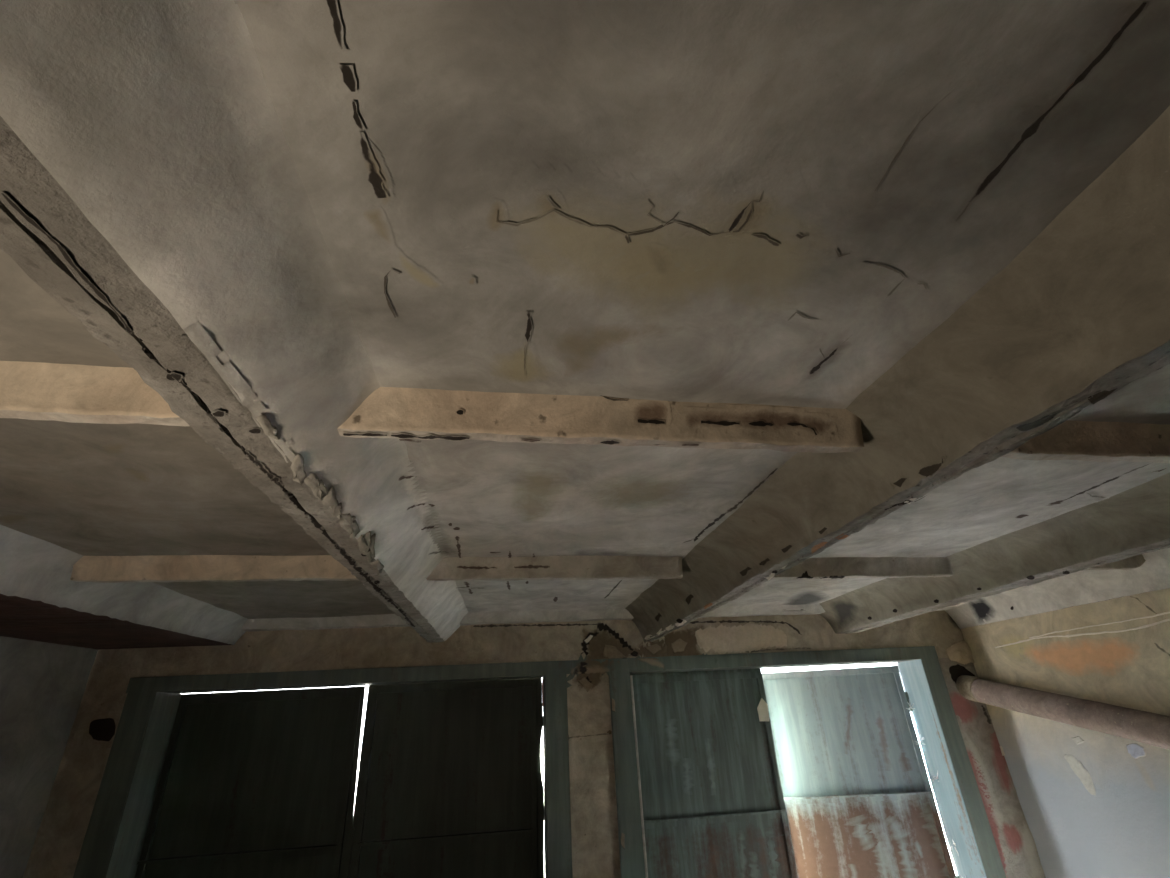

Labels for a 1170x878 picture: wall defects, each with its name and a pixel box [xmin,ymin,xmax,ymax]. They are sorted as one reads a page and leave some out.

crack [482,189,808,279]
crack [502,311,542,387]
crack [787,311,856,387]
crack [0,193,416,627]
spalling [180,321,384,576]
spalling [892,456,946,488]
spalling [1086,387,1120,405]
spalling [564,612,813,700]